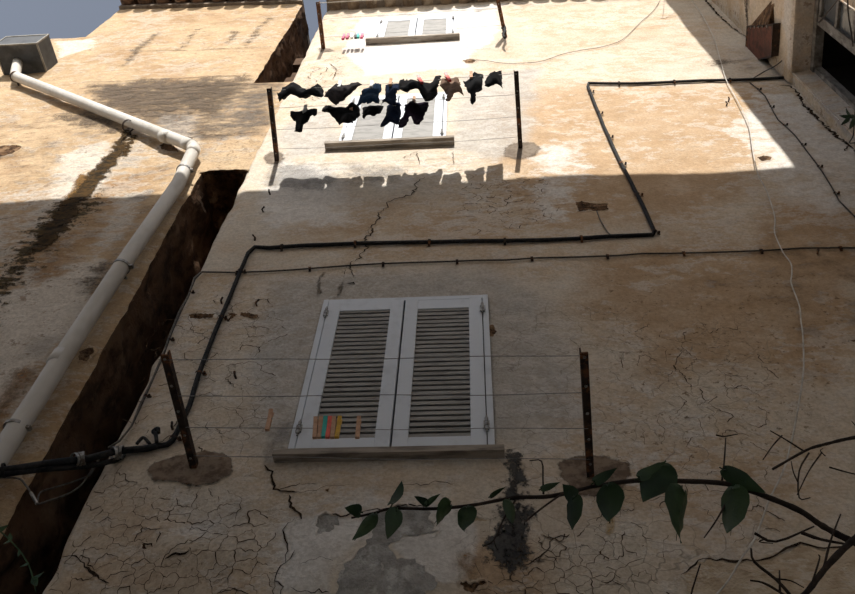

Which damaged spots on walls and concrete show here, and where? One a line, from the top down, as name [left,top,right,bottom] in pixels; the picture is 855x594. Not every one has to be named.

spalling [0,144,24,159]
leakage [54,112,118,133]
leakage [118,135,137,159]
leakage [81,75,250,118]
crack [782,84,855,152]
spalling [572,200,611,213]
crack [620,319,785,542]
crack [50,458,351,594]
flaking render [311,502,442,594]
mould [482,449,540,575]
crack [469,477,667,594]
flaking render [671,535,855,594]